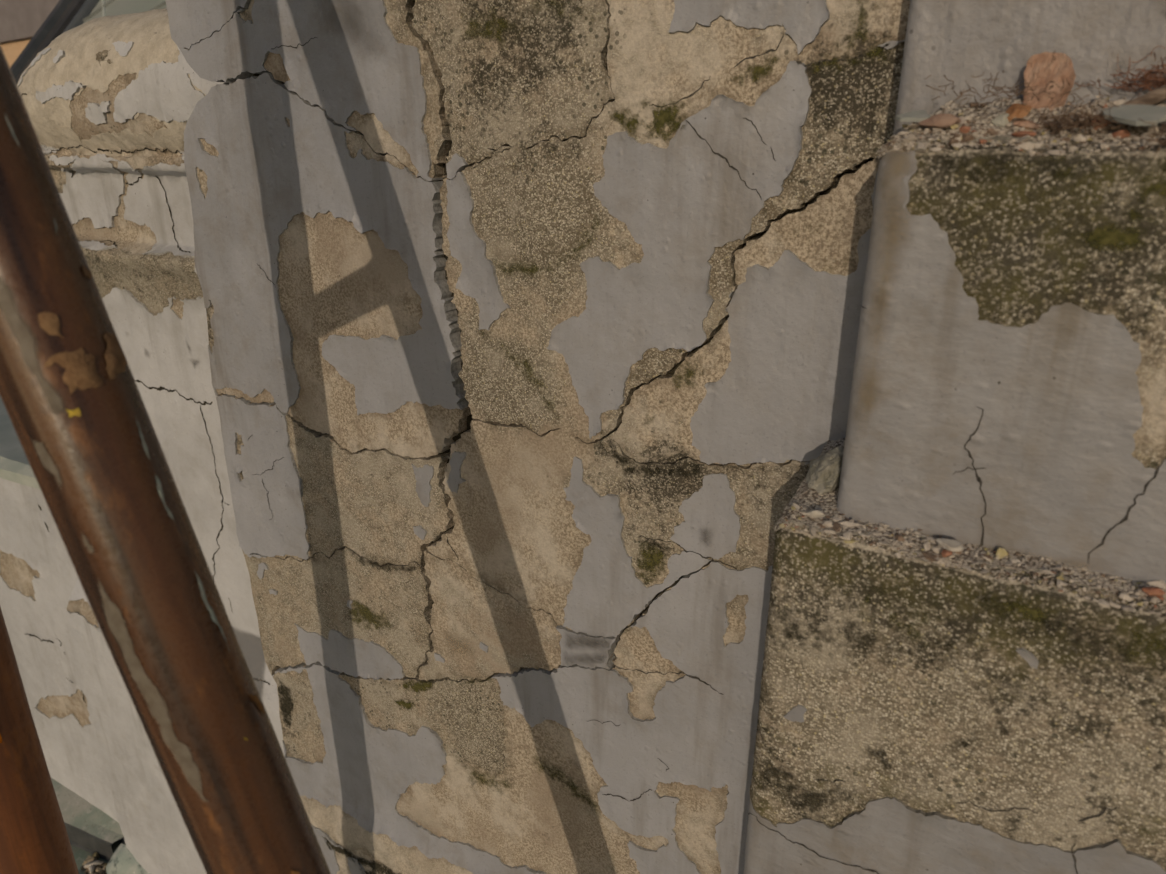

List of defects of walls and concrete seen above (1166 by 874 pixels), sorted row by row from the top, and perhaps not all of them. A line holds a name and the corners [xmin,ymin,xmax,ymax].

peeling [17,8,214,353]
crack [652,78,874,249]
peeling [0,550,40,599]
peeling [67,599,99,627]
crack [136,380,233,613]
crack [434,414,473,466]
crack [601,315,729,439]
crack [614,535,738,695]
peeling [242,0,1166,874]
crack [955,408,986,547]
crack [1088,467,1159,562]
peeling [37,689,91,727]